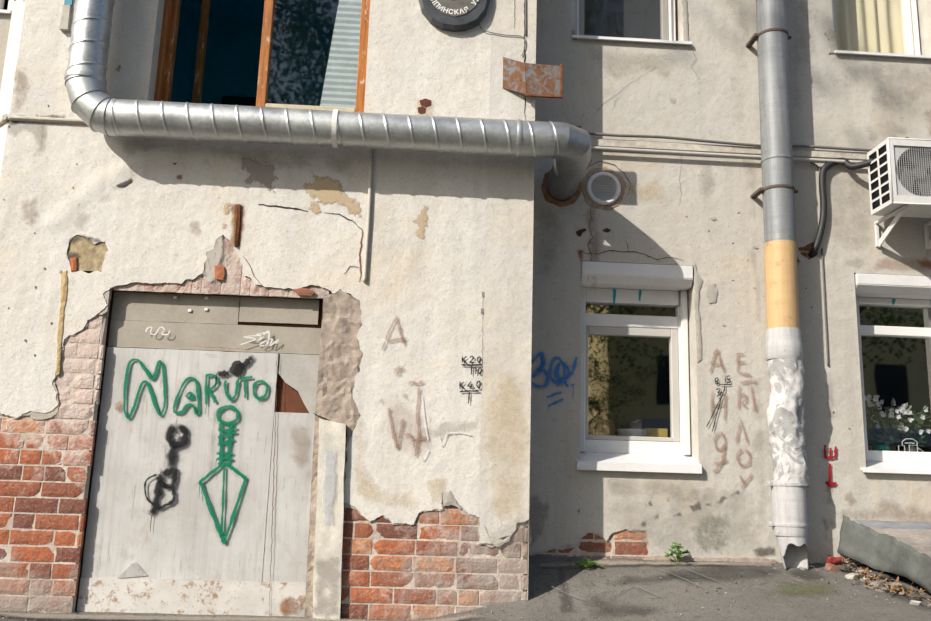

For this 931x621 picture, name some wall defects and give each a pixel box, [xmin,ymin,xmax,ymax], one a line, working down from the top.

crack [514,0,526,63]
crack [258,204,363,280]
peeling [303,176,361,215]
peeling [413,206,428,239]
crack [578,210,681,280]
spalling [0,202,362,618]
spalling [341,494,649,620]